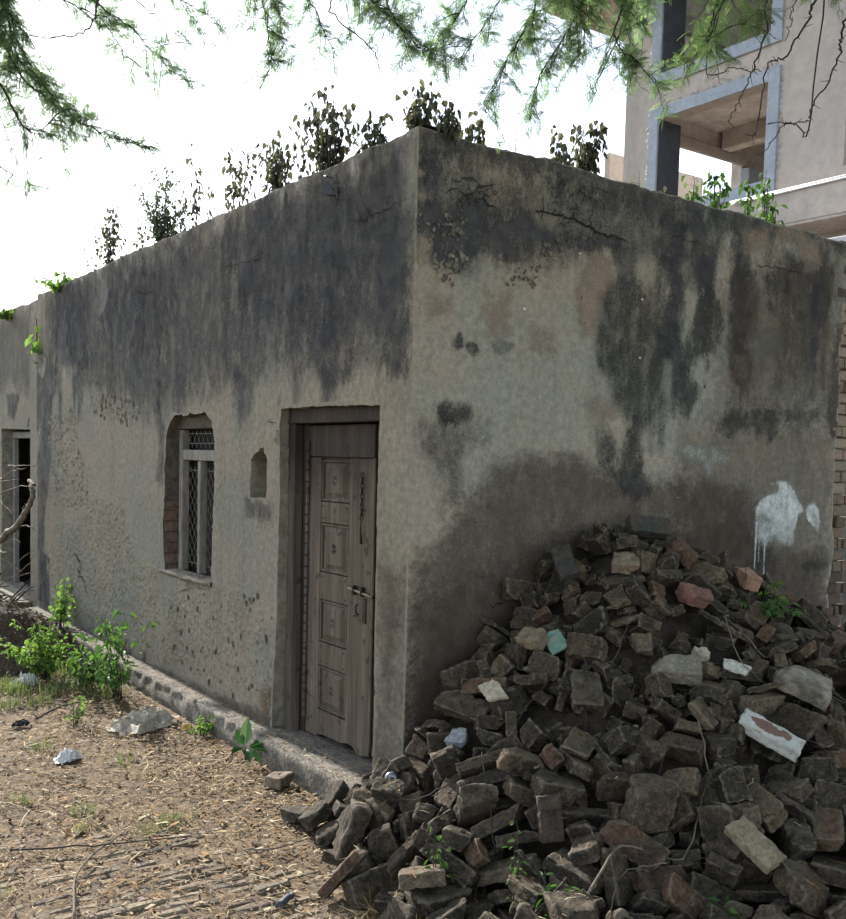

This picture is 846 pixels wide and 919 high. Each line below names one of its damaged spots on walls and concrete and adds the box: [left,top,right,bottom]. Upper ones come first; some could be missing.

flaking render [411,192,469,287]
crack [445,177,502,209]
flaking render [506,238,571,290]
crack [536,181,632,244]
leakage [36,128,846,742]